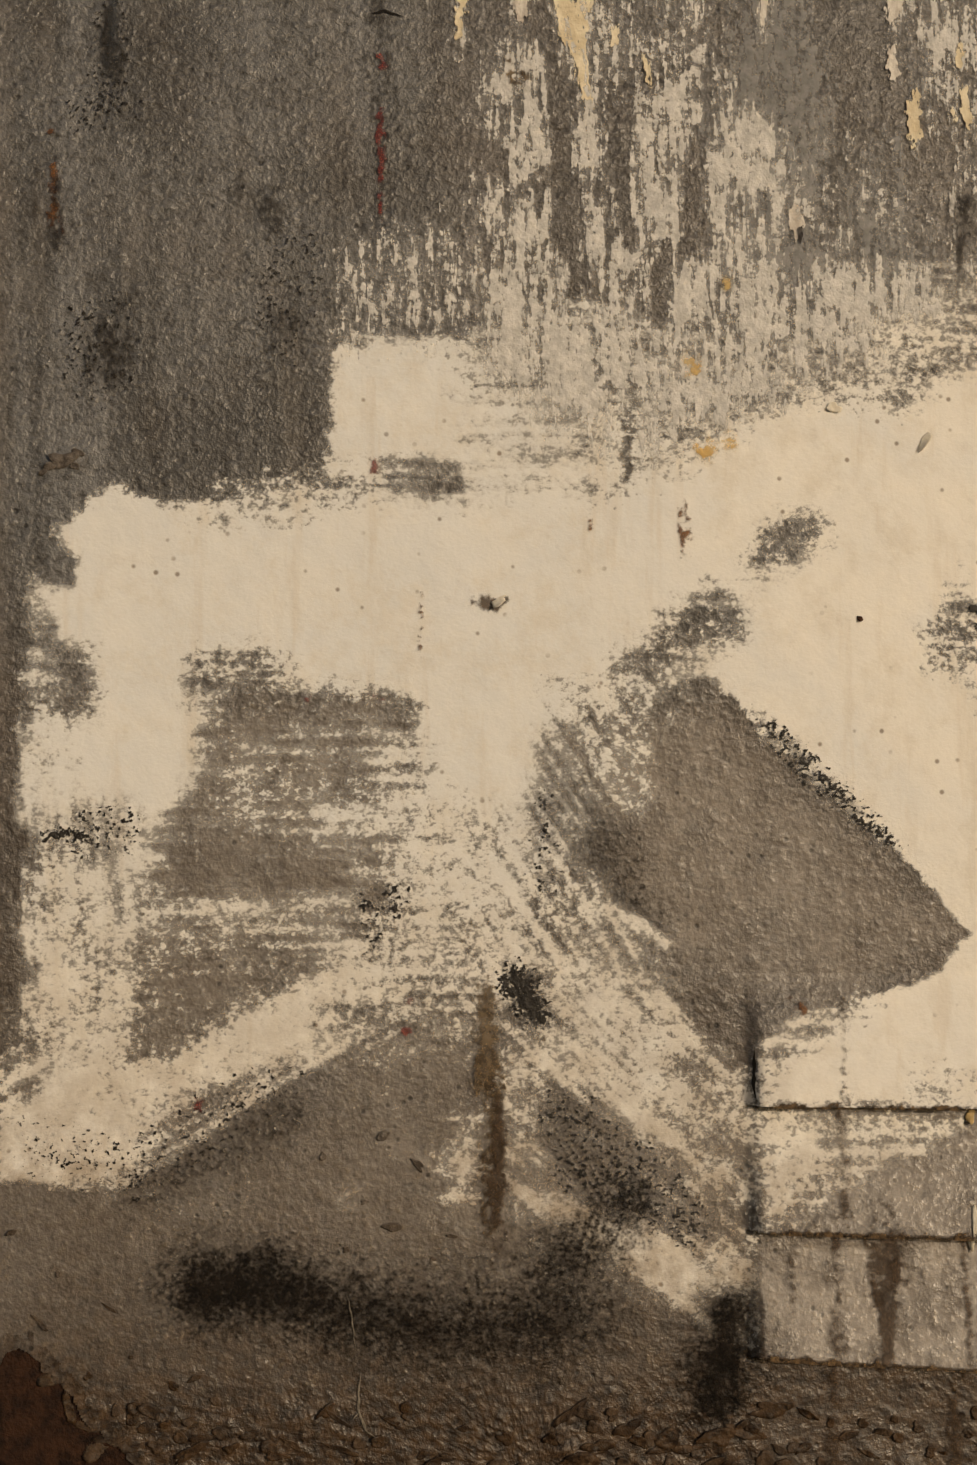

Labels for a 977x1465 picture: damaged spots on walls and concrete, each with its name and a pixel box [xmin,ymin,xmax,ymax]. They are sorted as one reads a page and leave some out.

water stain [470,975,509,1247]
peeling [0,1314,302,1465]
peeling [315,1402,415,1465]
peeling [417,1450,453,1465]
water stain [946,1237,975,1465]